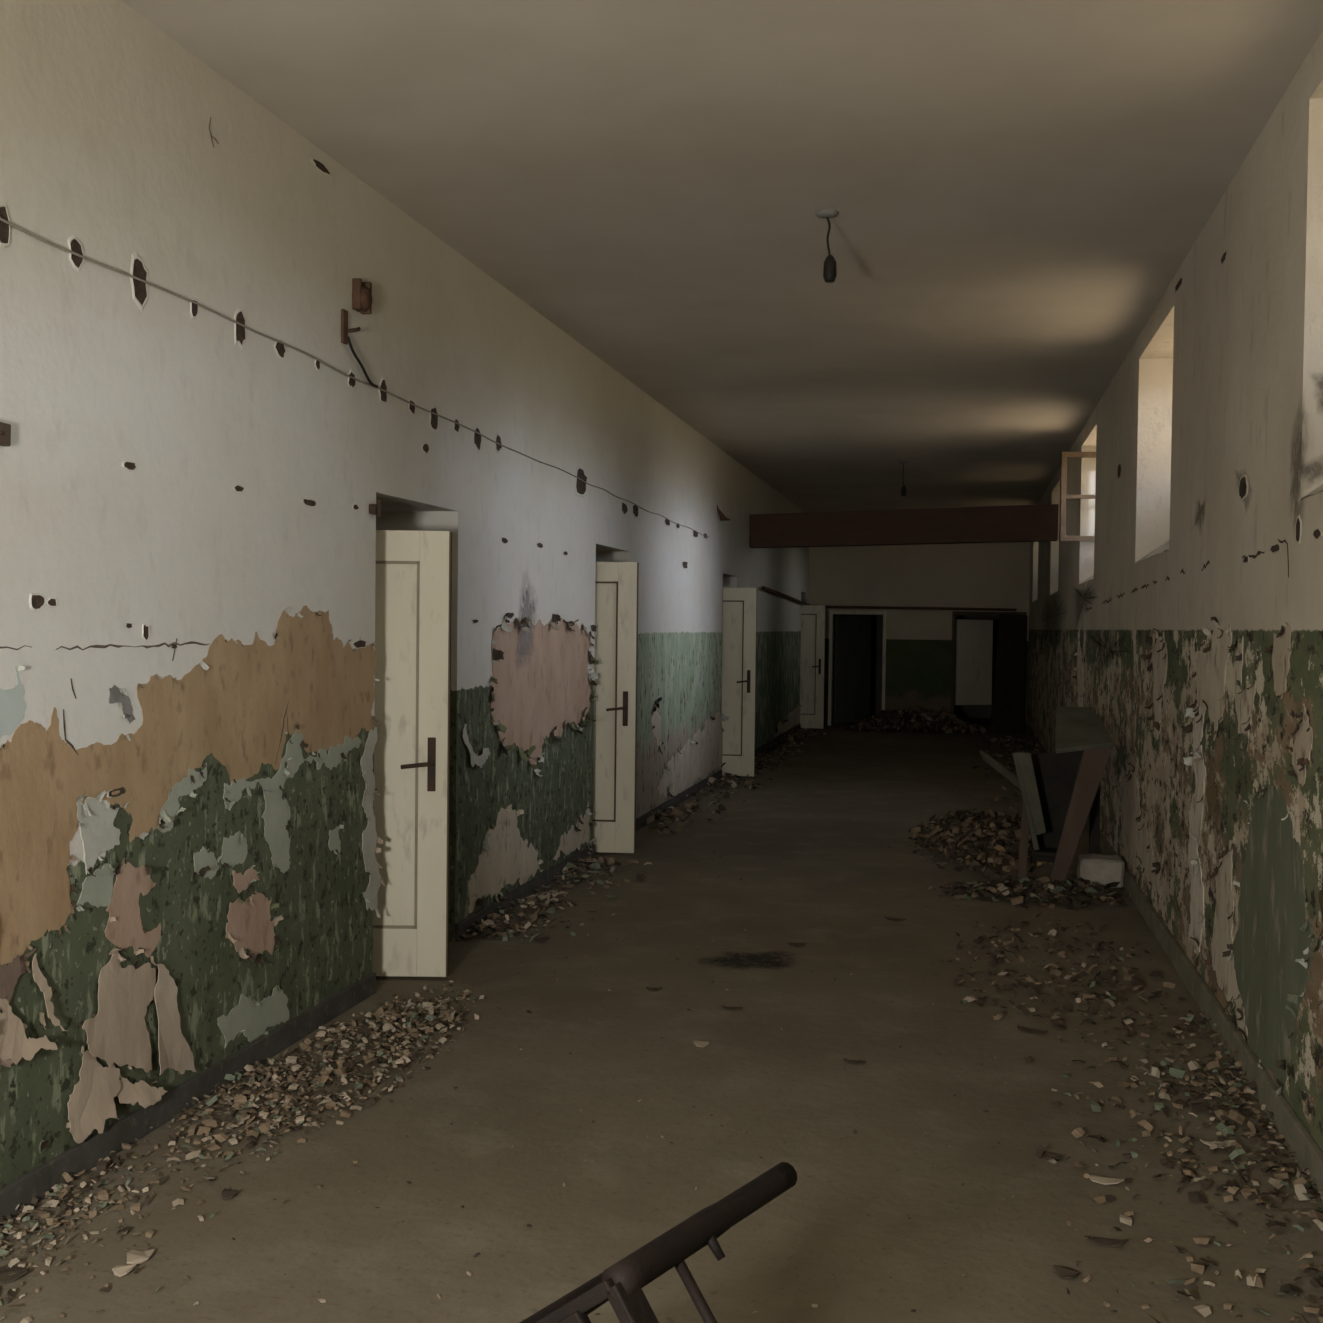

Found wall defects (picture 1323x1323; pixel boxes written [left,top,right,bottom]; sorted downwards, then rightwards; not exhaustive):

crack [0,638,209,755]
peeling [462,612,599,777]
peeling [651,697,729,801]
peeling [1144,628,1167,741]
peeling [0,606,385,1144]
peeling [467,802,597,913]
peeling [1181,617,1323,1097]